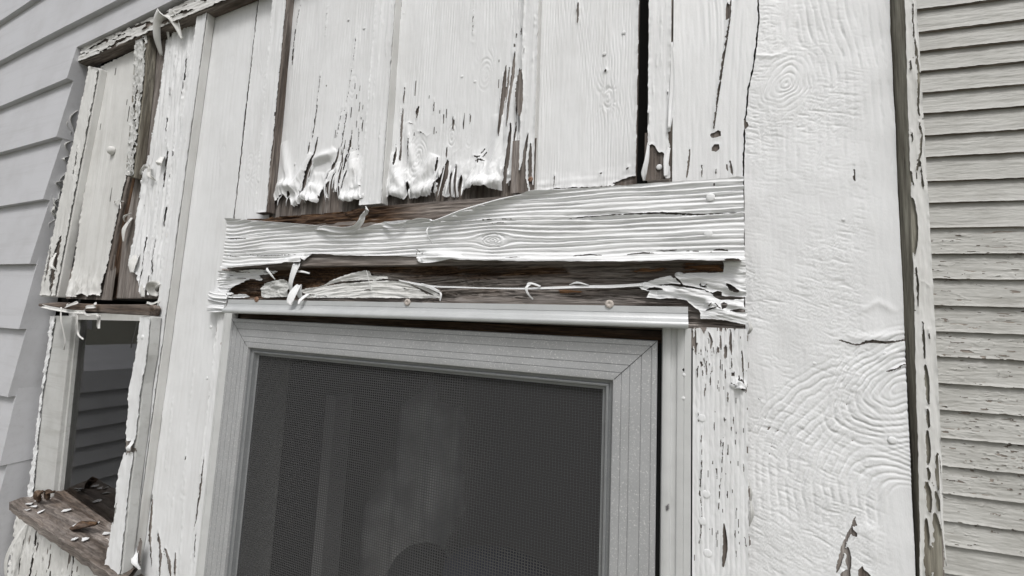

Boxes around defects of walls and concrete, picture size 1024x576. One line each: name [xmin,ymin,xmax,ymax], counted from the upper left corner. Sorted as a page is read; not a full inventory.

peeling [78,0,223,296]
peeling [206,0,753,334]
peeling [43,110,116,300]
peeling [907,0,1024,576]
crack [832,334,906,374]
spalling [123,431,137,460]
peeling [10,517,89,576]
spalling [111,492,121,532]
peeling [829,506,878,576]